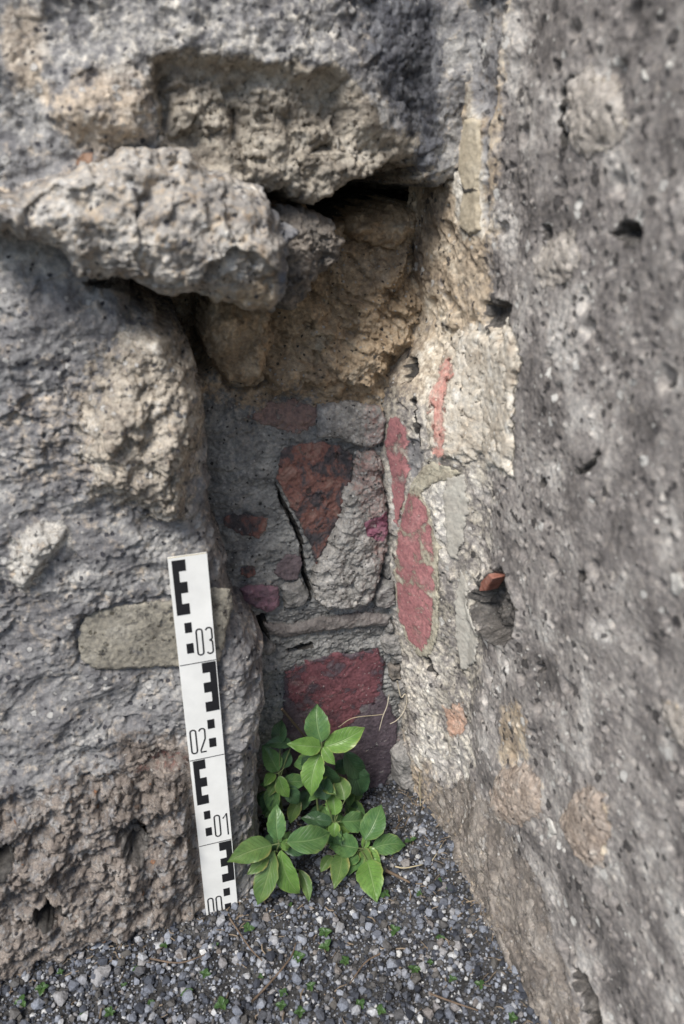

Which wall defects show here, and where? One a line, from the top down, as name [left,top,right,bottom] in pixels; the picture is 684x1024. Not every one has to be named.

crack [275,483,311,609]
flaking render [393,317,522,671]